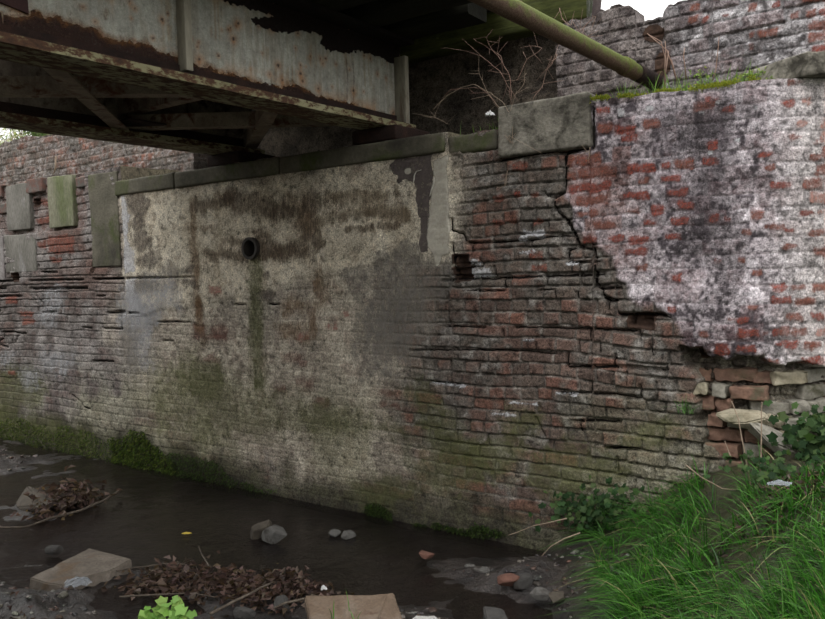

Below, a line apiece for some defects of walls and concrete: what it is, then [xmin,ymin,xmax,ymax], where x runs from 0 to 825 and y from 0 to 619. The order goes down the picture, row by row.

peeling [0,9,178,64]
peeling [224,0,400,64]
peeling [596,106,661,142]
crack [415,107,671,398]
peeling [567,152,649,271]
peeling [623,140,718,240]
peeling [750,210,793,232]
peeling [800,121,825,216]
spalling [626,307,676,330]
spalling [691,282,825,467]
crack [577,419,620,431]
crack [606,446,641,470]